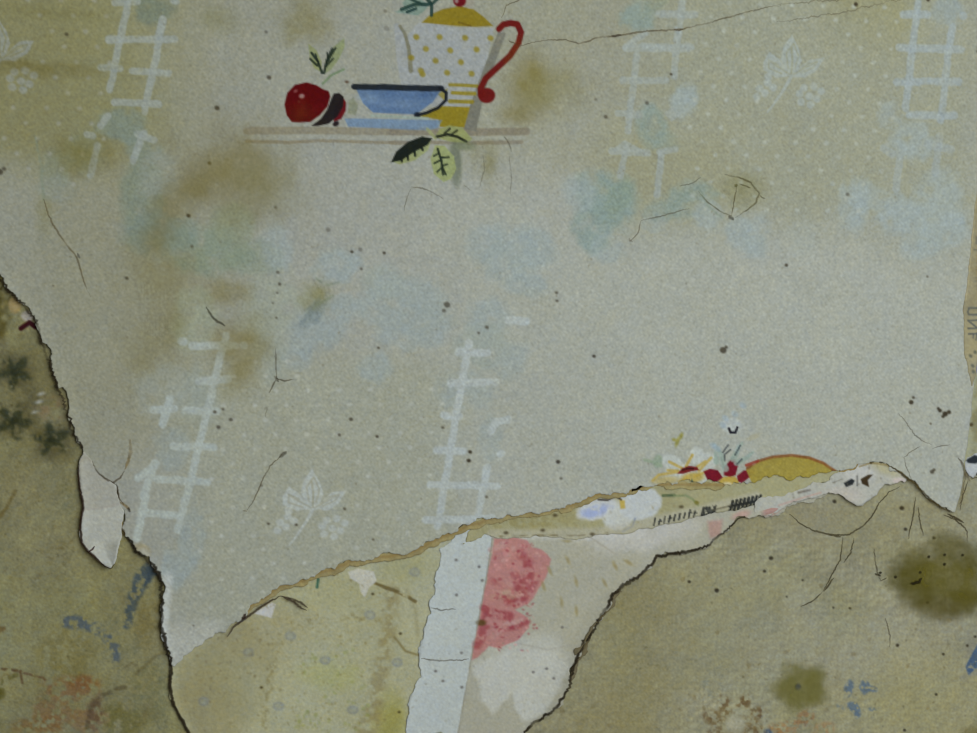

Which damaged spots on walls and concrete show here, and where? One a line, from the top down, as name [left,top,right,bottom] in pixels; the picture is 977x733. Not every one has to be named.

peeling [0,275,451,733]
peeling [525,472,977,733]
damp [894,554,977,608]